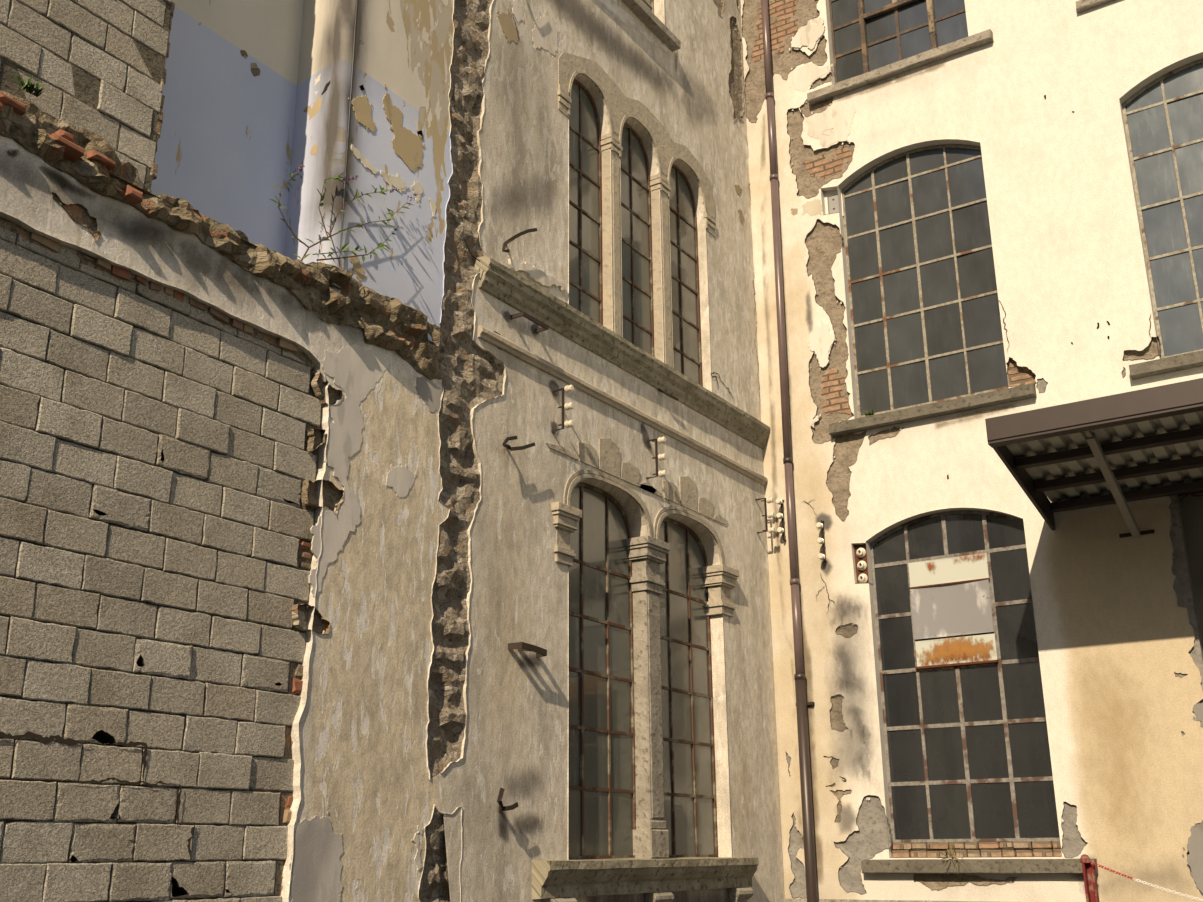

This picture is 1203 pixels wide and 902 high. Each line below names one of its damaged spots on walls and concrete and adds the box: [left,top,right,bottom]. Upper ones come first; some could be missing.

peeling [348,84,436,217]
flaking render [0,217,61,254]
spalling [51,192,101,242]
spalling [713,0,904,522]
peeling [76,250,386,634]
flaking render [289,662,303,695]
crack [0,731,195,856]
flaking render [284,726,293,759]
peeling [275,793,344,902]
spalling [788,813,807,898]
spalling [826,783,1087,894]
peeling [1182,820,1203,893]